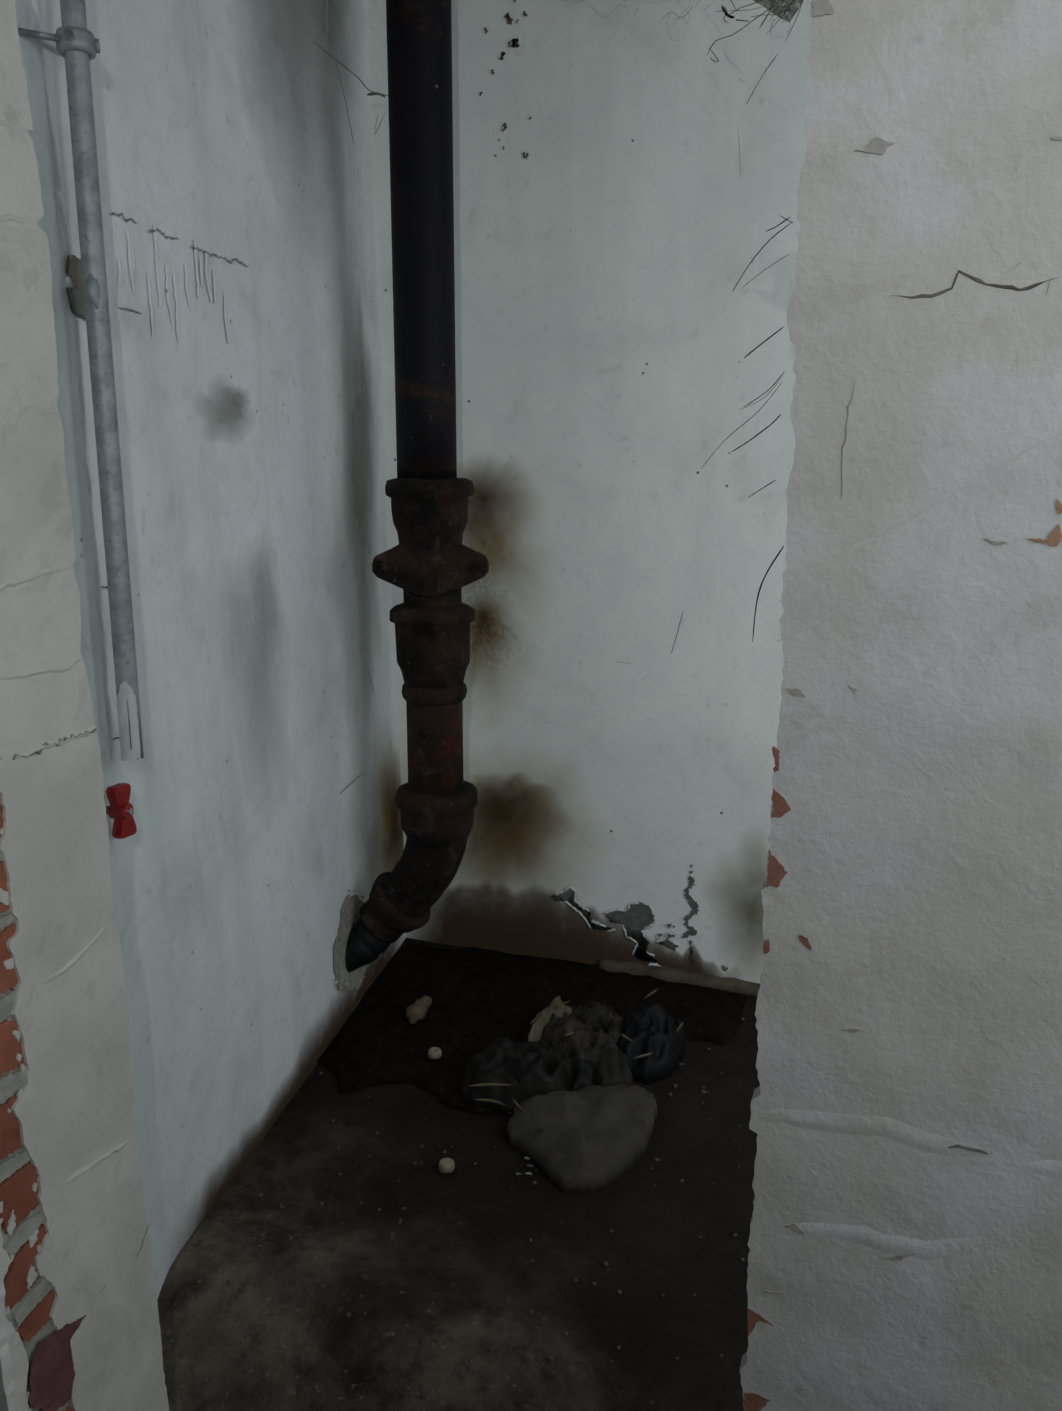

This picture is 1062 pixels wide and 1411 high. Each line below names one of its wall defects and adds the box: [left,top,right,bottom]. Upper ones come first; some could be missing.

crack [891,262,1058,299]
rust [468,478,510,575]
rust [470,608,503,667]
rust [381,779,403,866]
leakage [421,887,720,977]
peeling [551,864,699,966]
spalling [0,804,74,1411]